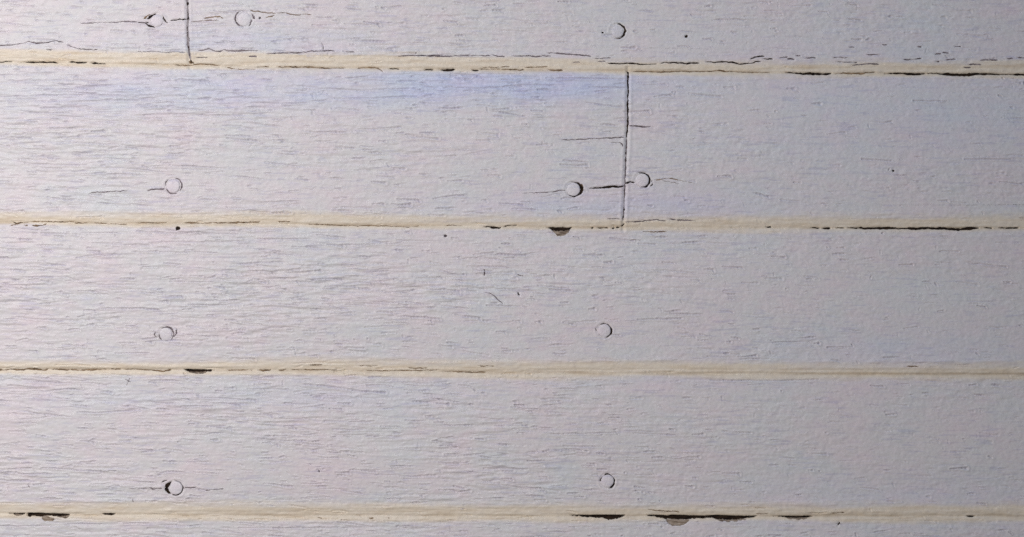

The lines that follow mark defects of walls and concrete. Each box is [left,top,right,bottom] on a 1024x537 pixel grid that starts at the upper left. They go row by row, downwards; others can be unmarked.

peeling [549,227,572,236]